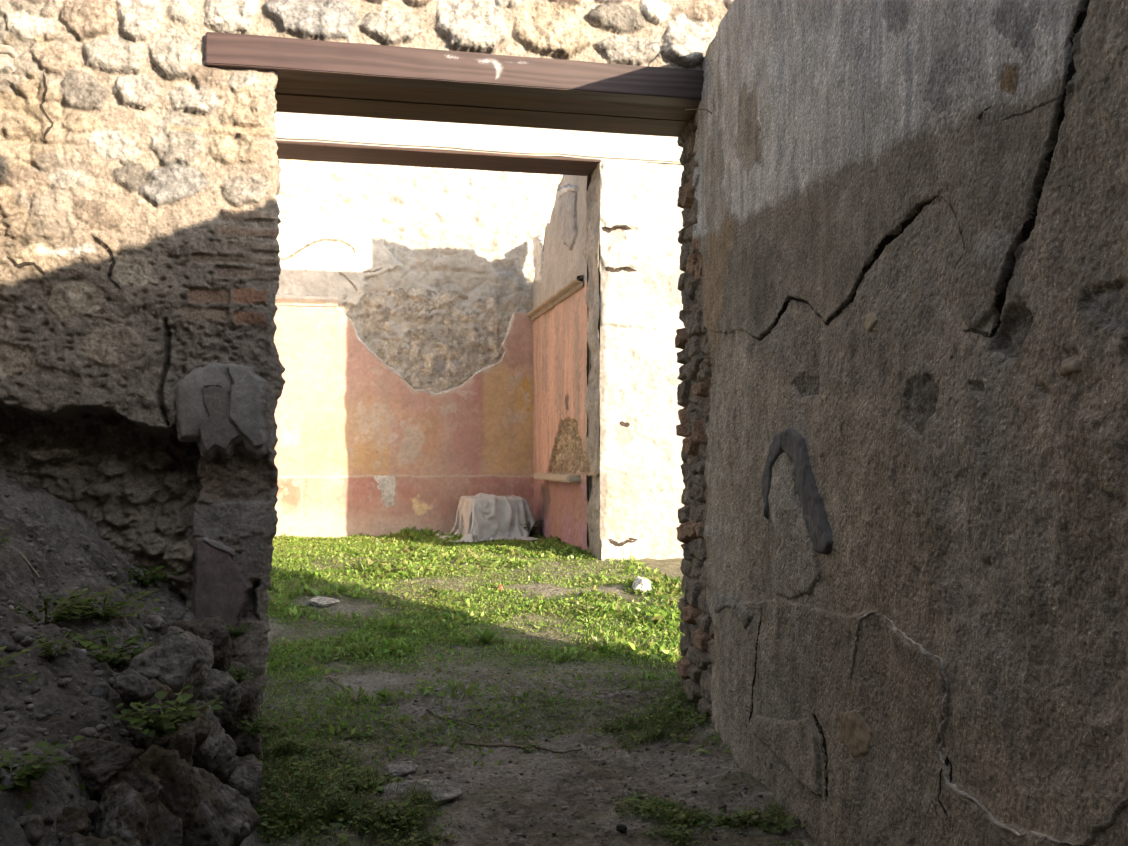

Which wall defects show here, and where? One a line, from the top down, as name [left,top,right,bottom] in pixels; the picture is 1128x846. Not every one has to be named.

peeling [0,0,18,76]
crack [962,0,1090,338]
flaking render [279,238,358,261]
crack [746,196,965,341]
flaking render [325,271,514,396]
flaking render [374,475,396,508]
crack [849,611,1128,846]